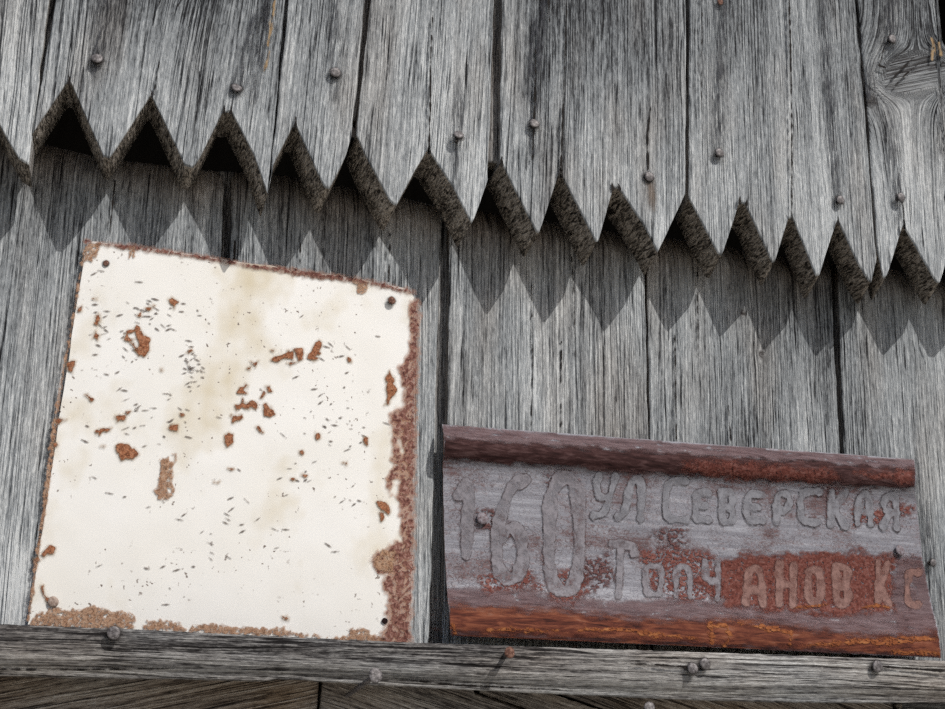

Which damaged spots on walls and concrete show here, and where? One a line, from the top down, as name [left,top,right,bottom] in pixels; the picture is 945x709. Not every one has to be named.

rust [27,239,421,642]
rust [443,426,915,501]
rust [476,509,518,541]
rust [851,505,915,526]
rust [448,527,941,658]